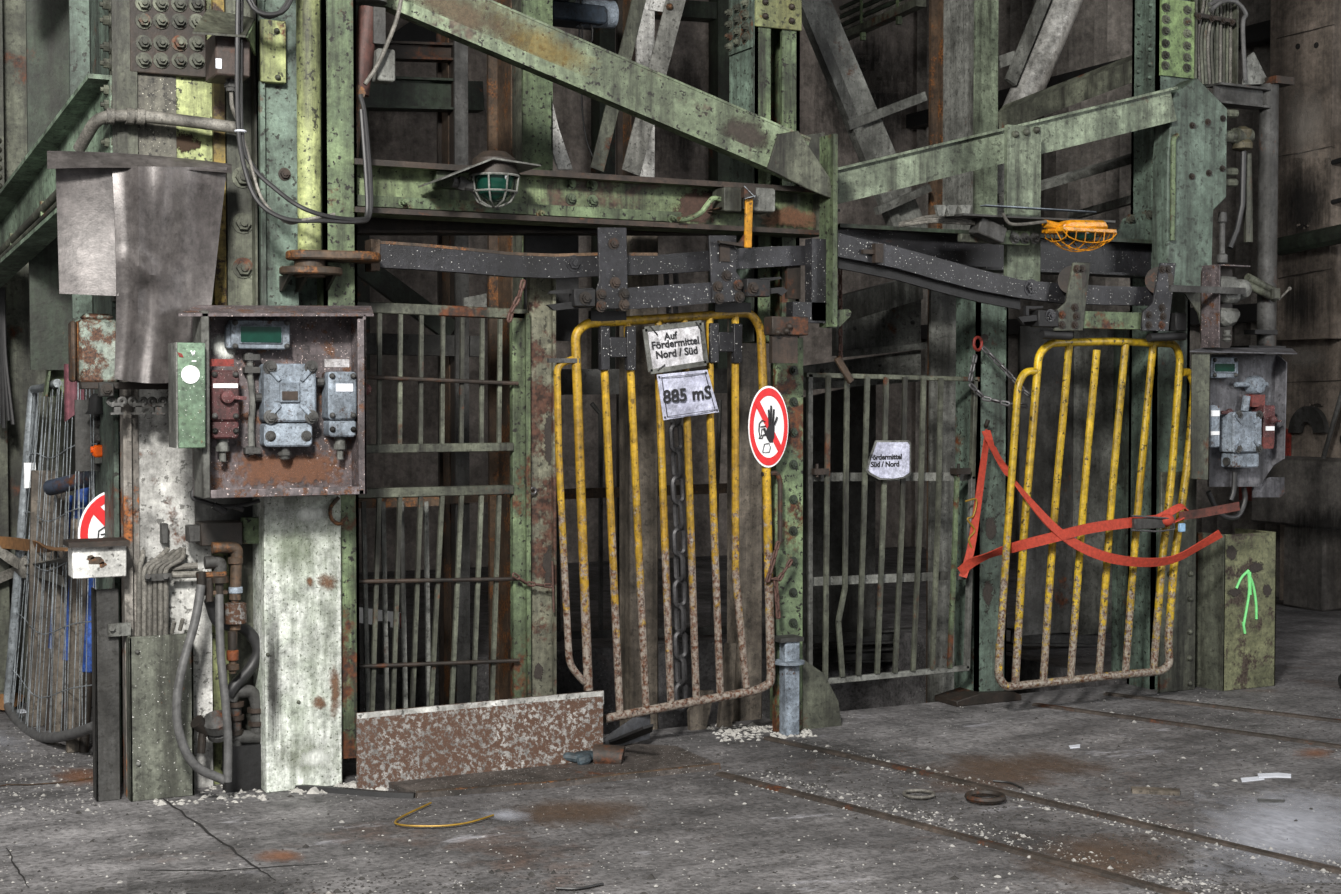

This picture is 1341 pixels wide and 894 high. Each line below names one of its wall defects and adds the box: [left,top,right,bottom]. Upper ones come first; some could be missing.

rust [423,0,522,43]
rust [623,0,631,32]
rust [497,59,512,156]
rust [623,112,631,176]
rust [725,118,768,148]
rust [443,356,451,486]
rust [226,451,351,487]
rust [498,277,513,700]
rust [307,576,334,589]
rust [443,504,451,705]
rust [313,669,340,715]
crack [163,798,323,880]